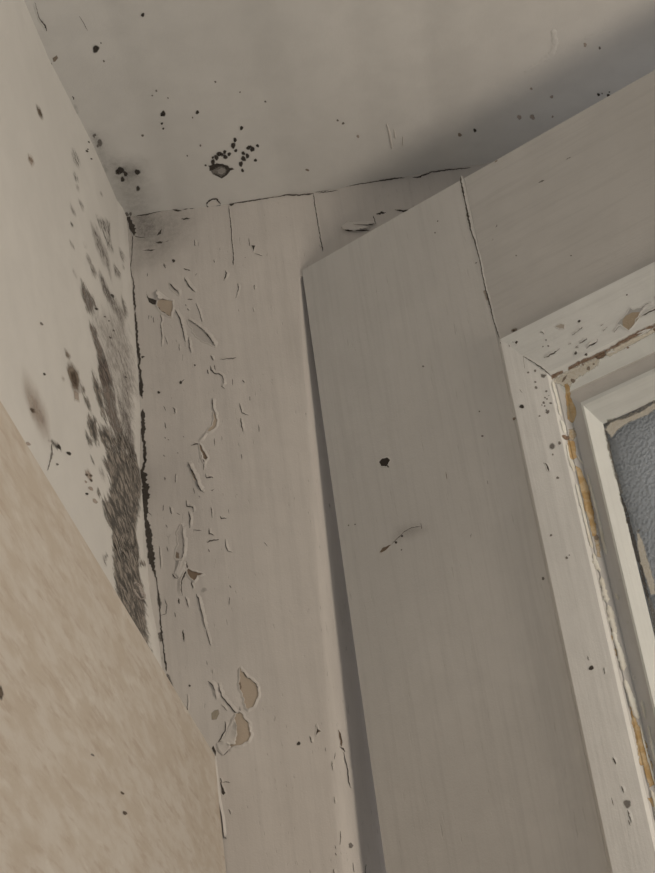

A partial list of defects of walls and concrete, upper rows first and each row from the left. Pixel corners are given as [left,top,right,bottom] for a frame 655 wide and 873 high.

water stain [205,126,259,178]
water stain [94,220,121,274]
peeling [147,267,218,348]
crack [229,166,501,338]
water stain [66,268,149,643]
peeling [159,398,219,596]
crack [127,208,259,712]
peeling [540,296,655,557]
peeling [206,661,261,838]
peeling [630,707,654,807]